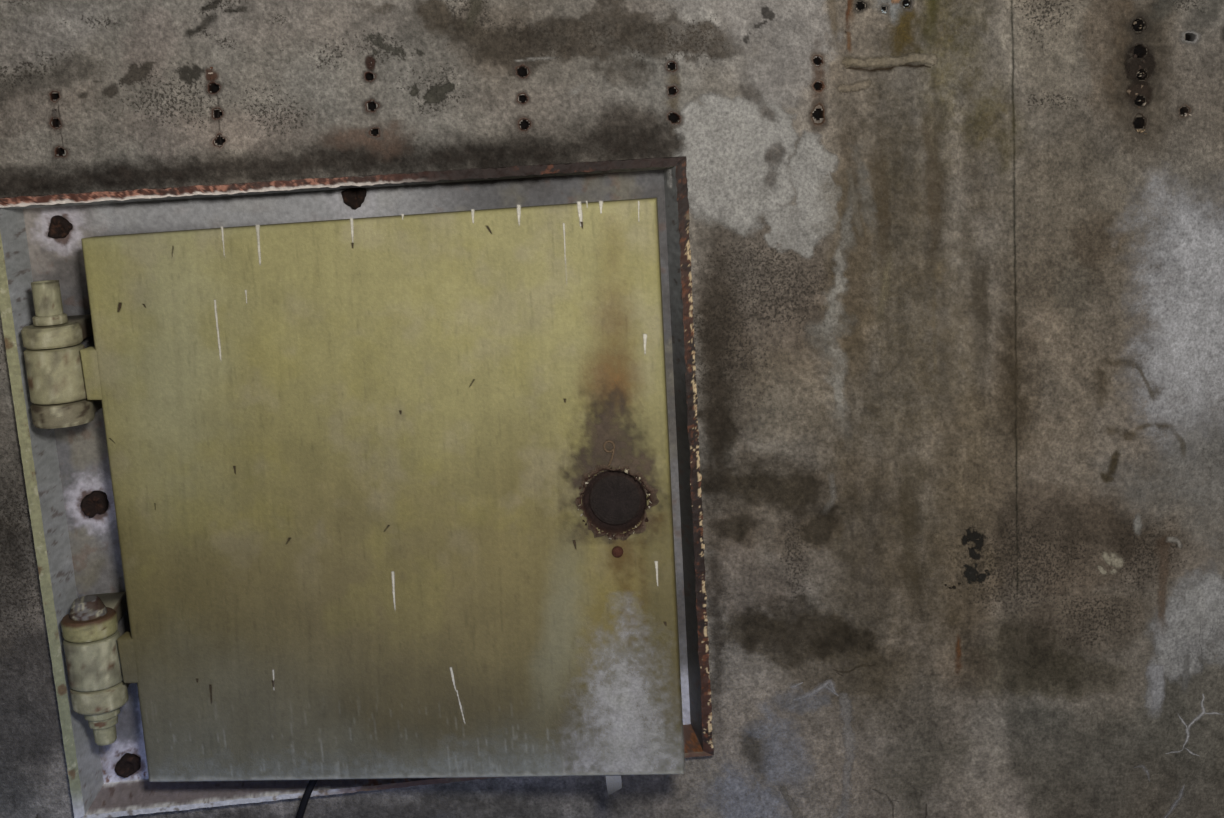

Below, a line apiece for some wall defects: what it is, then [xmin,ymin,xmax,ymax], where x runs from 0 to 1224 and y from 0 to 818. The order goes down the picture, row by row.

leakage [417,0,922,410]
leakage [699,306,836,545]
leakage [574,650,677,772]
leakage [742,596,867,657]
crack [1148,626,1224,781]